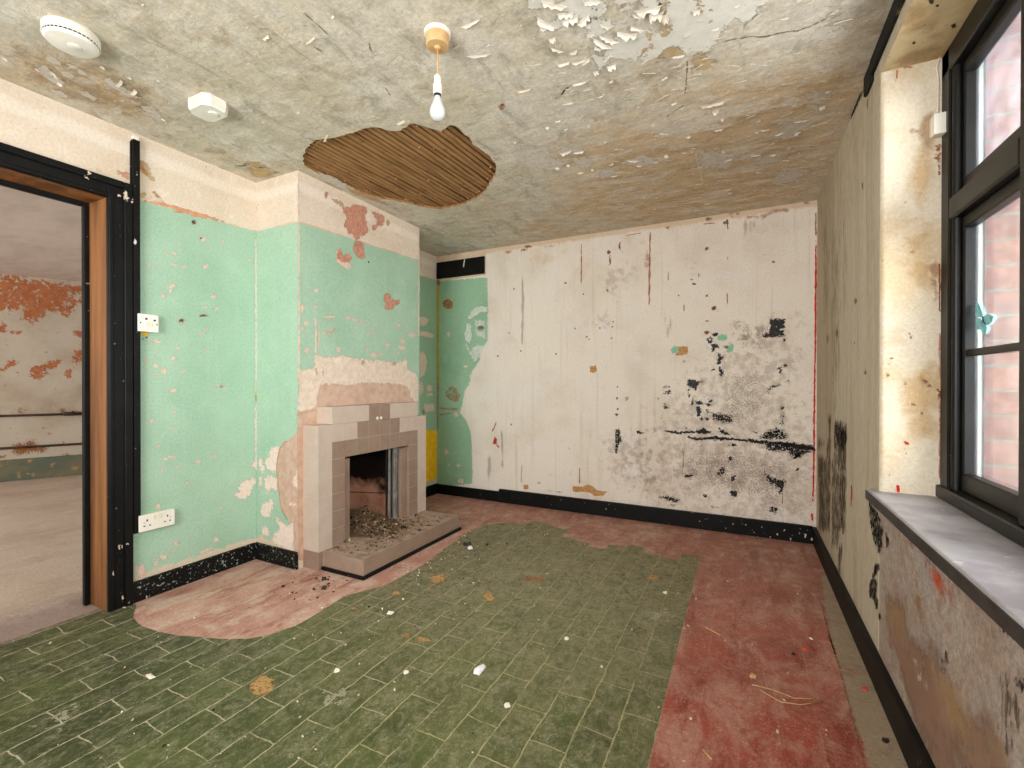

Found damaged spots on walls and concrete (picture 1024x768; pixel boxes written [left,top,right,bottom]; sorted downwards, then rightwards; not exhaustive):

peeling [34,52,96,102]
peeling [512,0,844,229]
peeling [0,274,82,334]
peeling [29,350,82,379]
flaking render [234,172,435,561]
peeling [671,346,688,355]
peeling [717,334,734,353]
peeling [572,468,607,500]
water stain [717,456,737,497]
water stain [760,406,847,574]
water stain [886,596,1006,768]